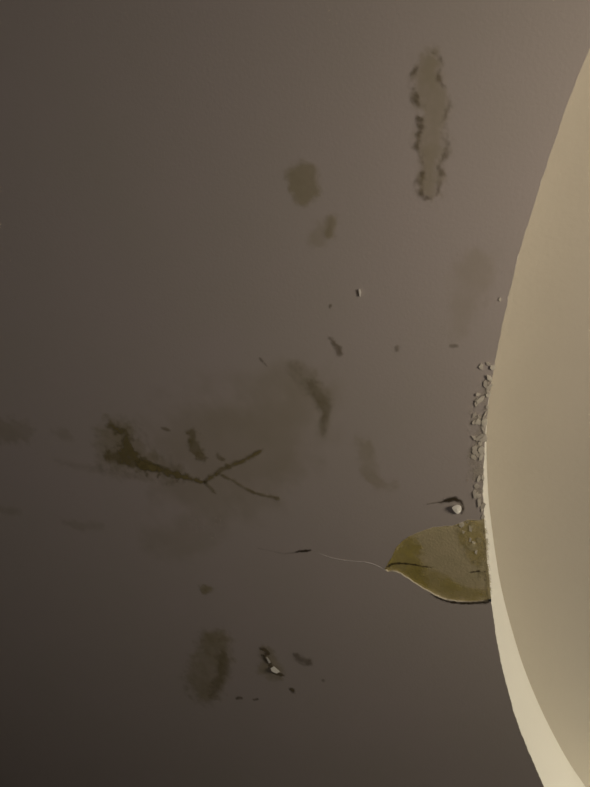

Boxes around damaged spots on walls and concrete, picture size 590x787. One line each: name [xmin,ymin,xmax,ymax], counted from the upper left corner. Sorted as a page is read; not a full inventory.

spalling [385,362,495,604]
crack [296,550,384,570]
spalling [260,648,284,676]